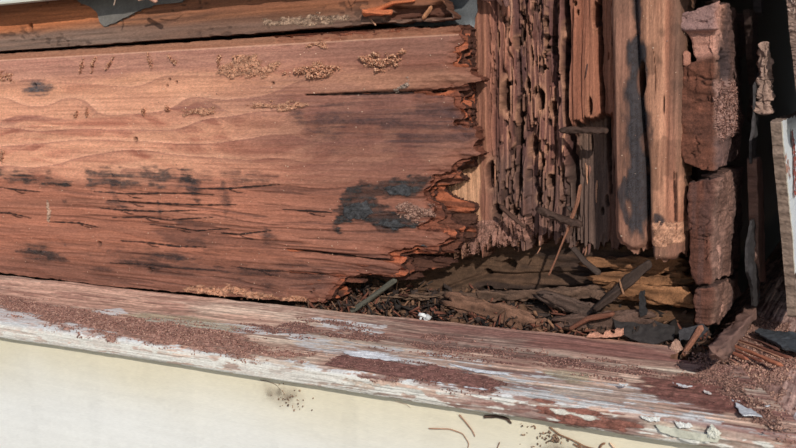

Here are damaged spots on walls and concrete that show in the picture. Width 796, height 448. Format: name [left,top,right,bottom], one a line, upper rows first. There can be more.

crack [307,89,416,97]
water stain [618,0,664,235]
water stain [0,169,72,186]
water stain [86,169,198,202]
corrosion [785,130,796,198]
peeling [325,351,509,391]
peeling [618,375,771,417]
peeling [532,398,721,443]